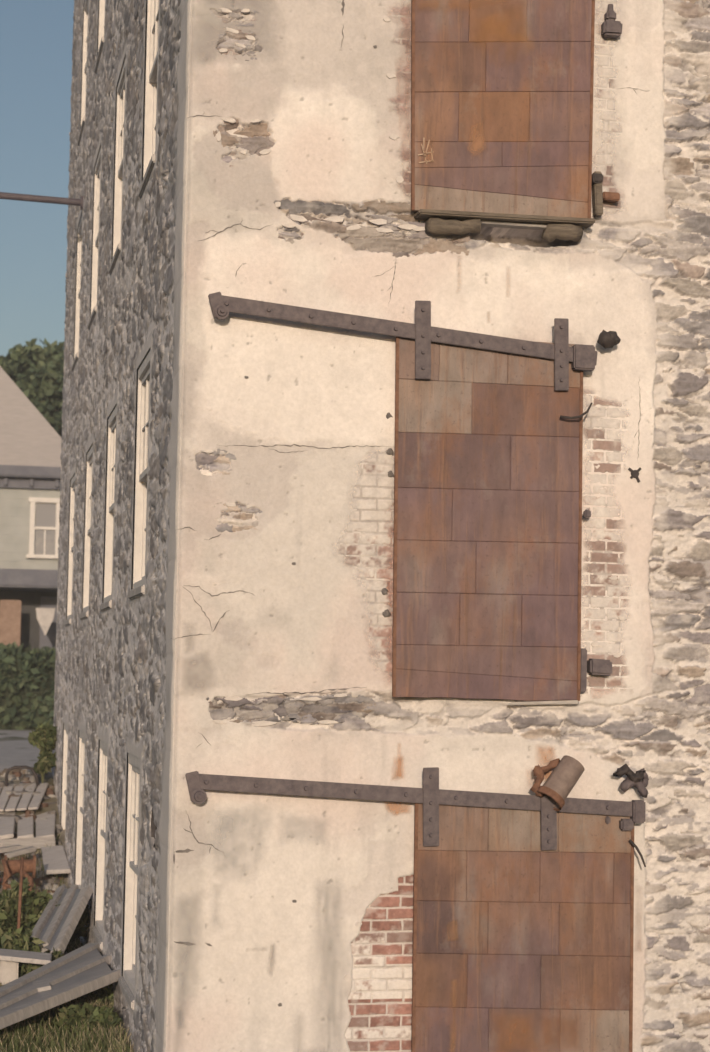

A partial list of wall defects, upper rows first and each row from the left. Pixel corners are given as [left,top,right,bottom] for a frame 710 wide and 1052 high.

flaking render [211,8,263,61]
flaking render [213,117,275,167]
flaking render [273,152,470,258]
flaking render [195,449,236,476]
flaking render [214,502,262,532]
flaking render [338,448,394,675]
crack [171,585,255,639]
flaking render [206,692,376,726]
crack [173,812,227,863]
flaking render [344,874,414,1052]